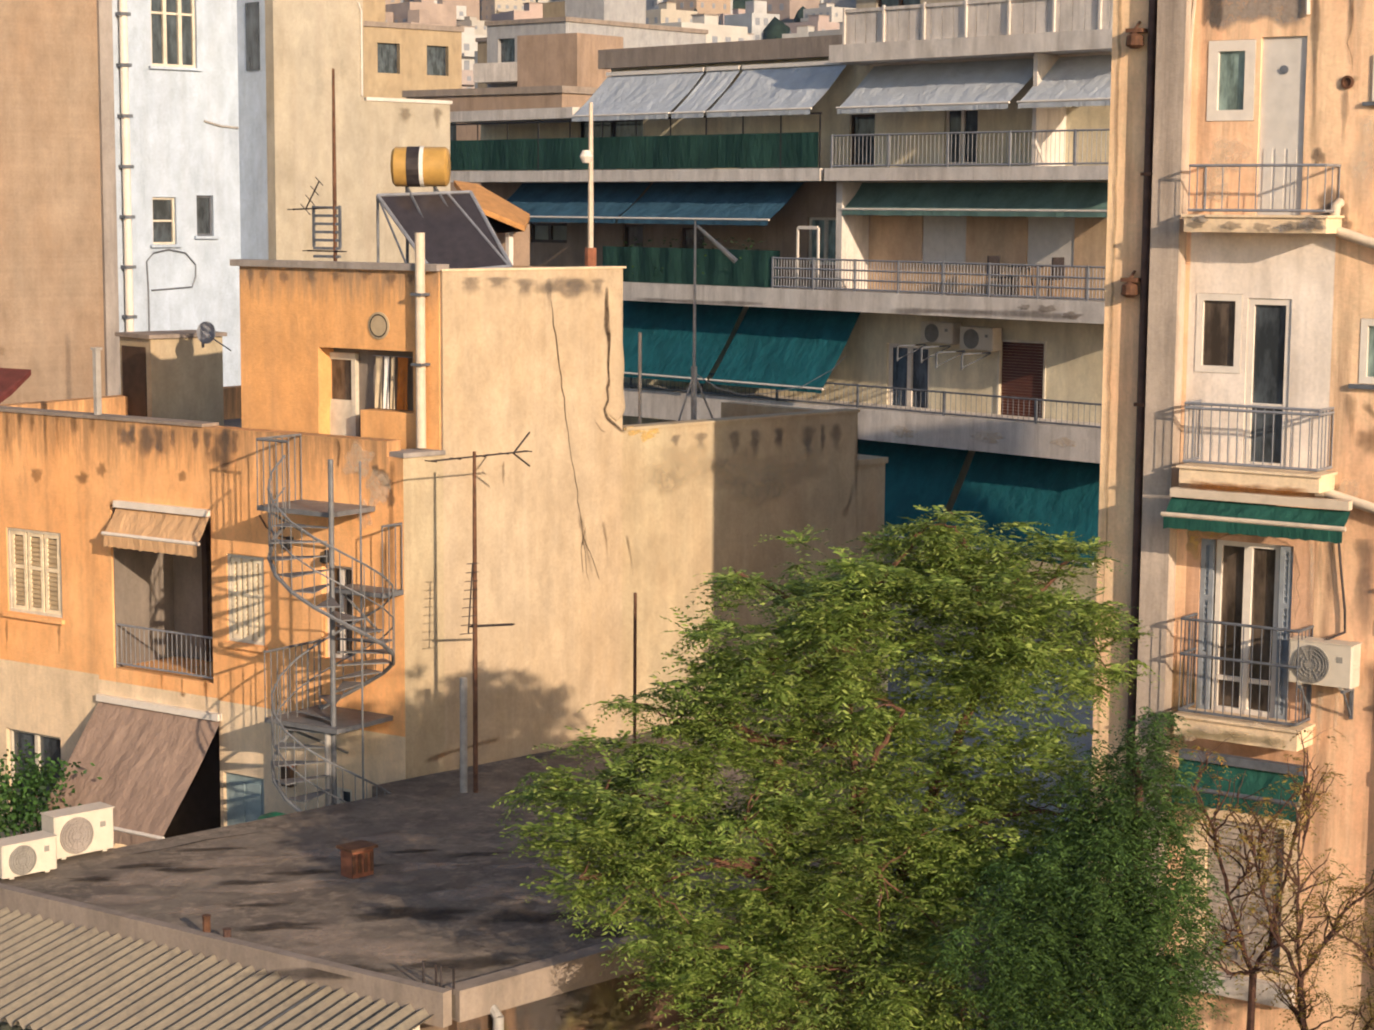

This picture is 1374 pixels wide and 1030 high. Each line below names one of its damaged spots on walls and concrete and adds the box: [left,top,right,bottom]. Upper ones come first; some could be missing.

crack [551,304,599,578]
crack [604,295,621,430]